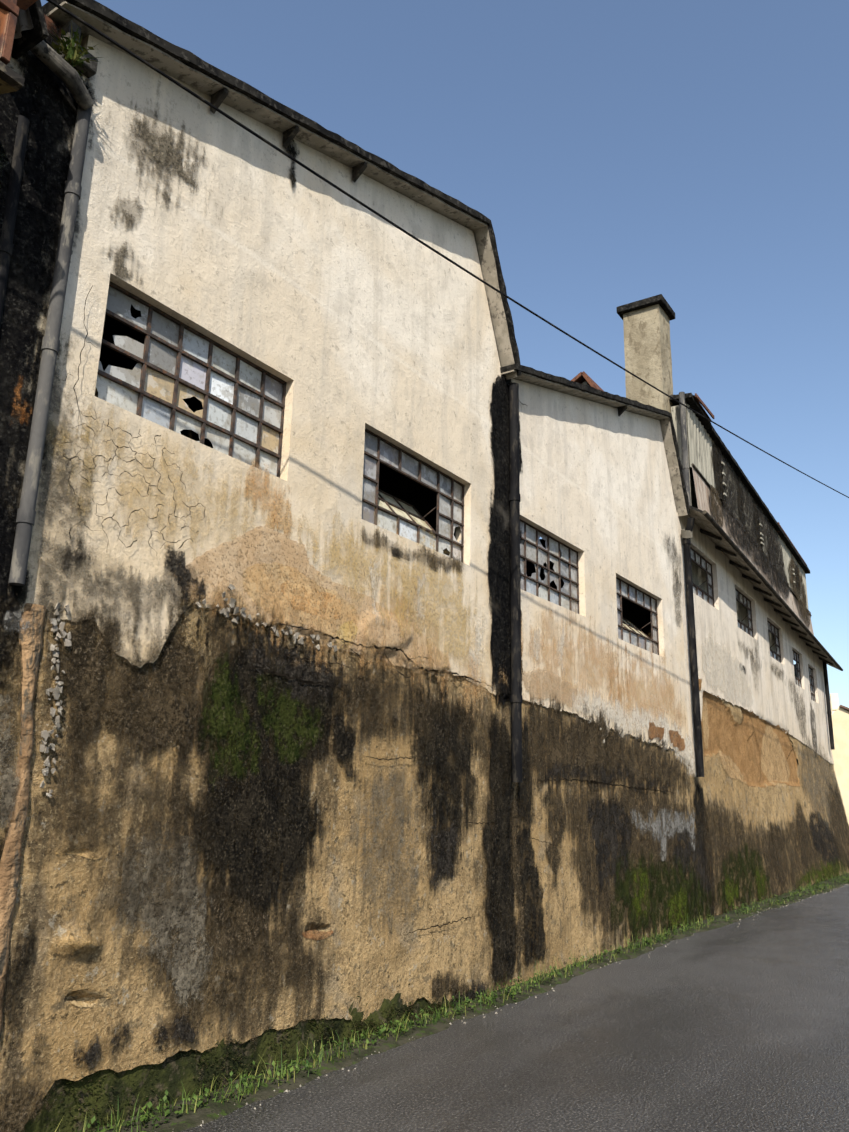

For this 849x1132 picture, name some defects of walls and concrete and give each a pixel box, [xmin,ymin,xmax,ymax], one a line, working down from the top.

mould [131,106,205,208]
mould [108,198,142,281]
crack [54,285,205,553]
water stain [490,375,505,440]
water stain [0,500,25,707]
peeling [173,526,451,680]
mould [710,441,811,627]
mould [163,546,365,945]
water stain [312,520,566,987]
water stain [572,690,696,774]
water stain [772,665,817,752]
water stain [588,798,710,919]